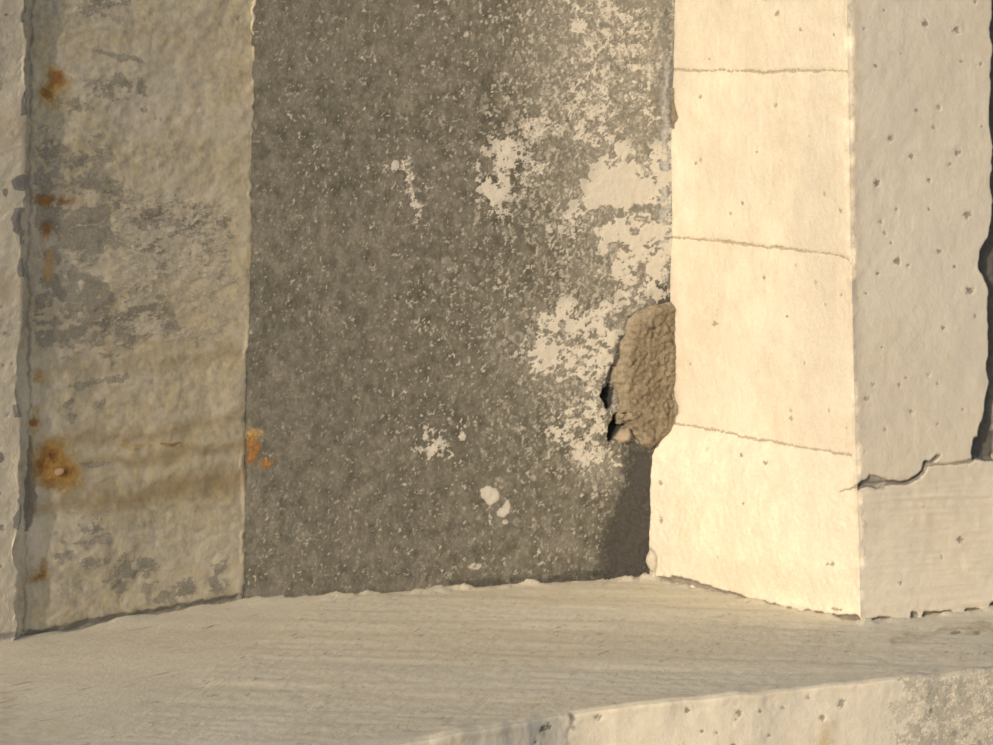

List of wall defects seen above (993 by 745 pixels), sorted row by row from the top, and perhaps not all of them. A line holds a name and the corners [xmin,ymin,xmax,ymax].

corrosion [41,67,67,104]
crack [674,67,848,75]
peeling [382,138,443,241]
spalling [463,0,678,485]
crack [673,236,849,260]
crack [843,0,993,491]
corrosion [32,438,82,492]
corrosion [246,429,272,468]
peeling [411,425,455,464]
crack [674,423,851,456]